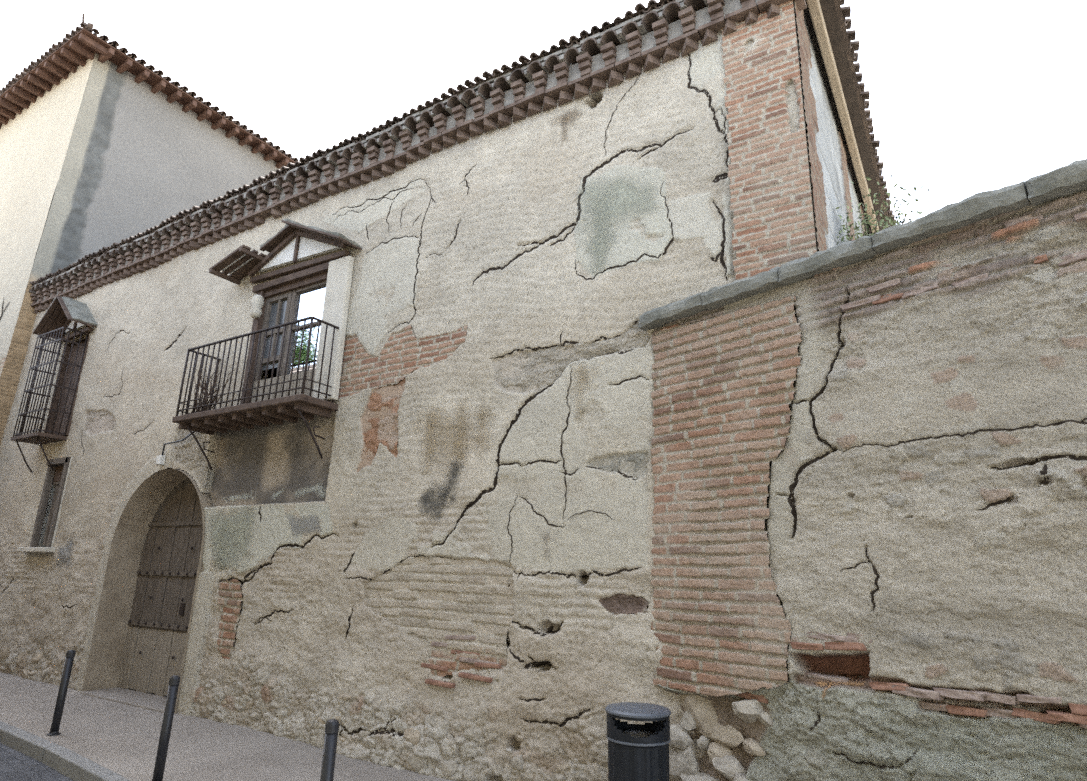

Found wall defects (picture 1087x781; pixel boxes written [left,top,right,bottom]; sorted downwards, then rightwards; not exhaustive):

crack [473,54,729,284]
crack [333,179,460,333]
flaking render [840,273,988,313]
flaking render [338,325,467,461]
crack [219,321,650,587]
crack [778,290,1087,538]
flaking render [217,579,243,659]
crack [255,609,293,624]
flaking render [362,556,514,688]
spalling [599,594,648,615]
crack [841,548,880,611]
flaking render [869,682,1087,728]